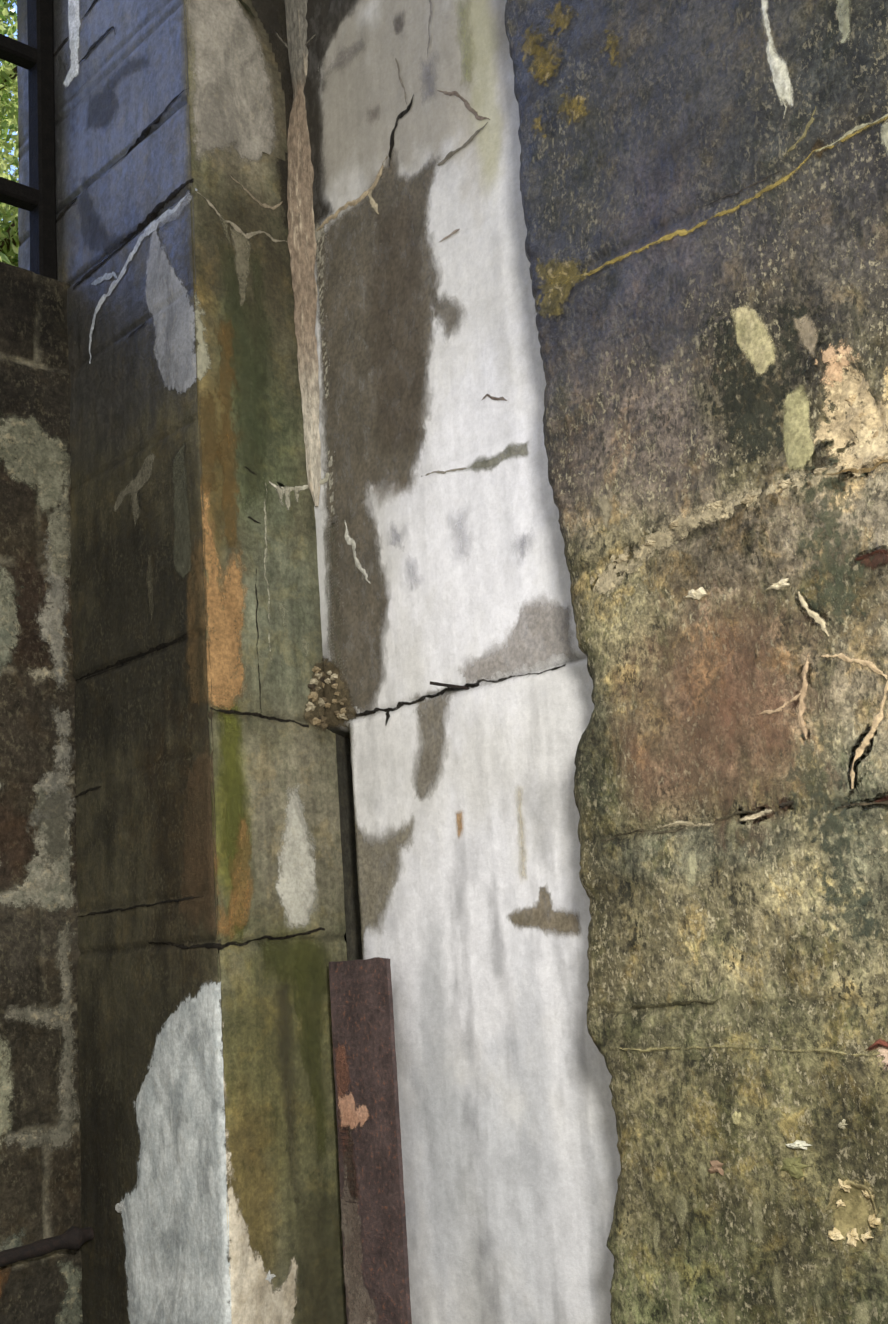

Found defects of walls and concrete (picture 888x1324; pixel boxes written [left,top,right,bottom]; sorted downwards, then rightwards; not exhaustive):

crack [73,0,490,364]
crack [577,107,888,277]
rust [187,321,244,710]
spalling [590,343,888,600]
crack [355,664,566,725]
crack [758,591,888,808]
flaking render [0,1230,25,1252]
flaking render [56,1261,83,1324]
peeling [115,982,298,1324]